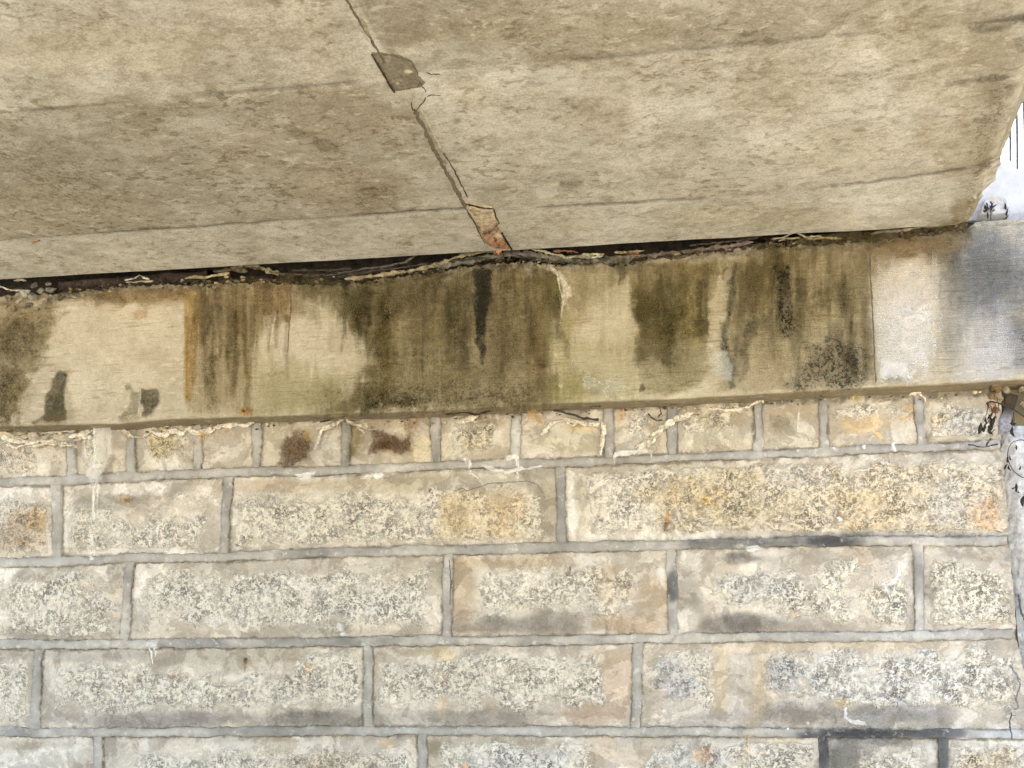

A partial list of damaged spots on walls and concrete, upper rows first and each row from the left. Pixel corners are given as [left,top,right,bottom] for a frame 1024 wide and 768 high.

spalling [371,52,425,93]
crack [411,72,441,111]
water stain [954,75,1013,214]
crack [465,203,513,250]
water stain [89,226,896,415]
water stain [0,292,71,424]
corrosion [184,292,199,402]
water stain [119,385,159,422]
efflorescence [613,450,652,469]